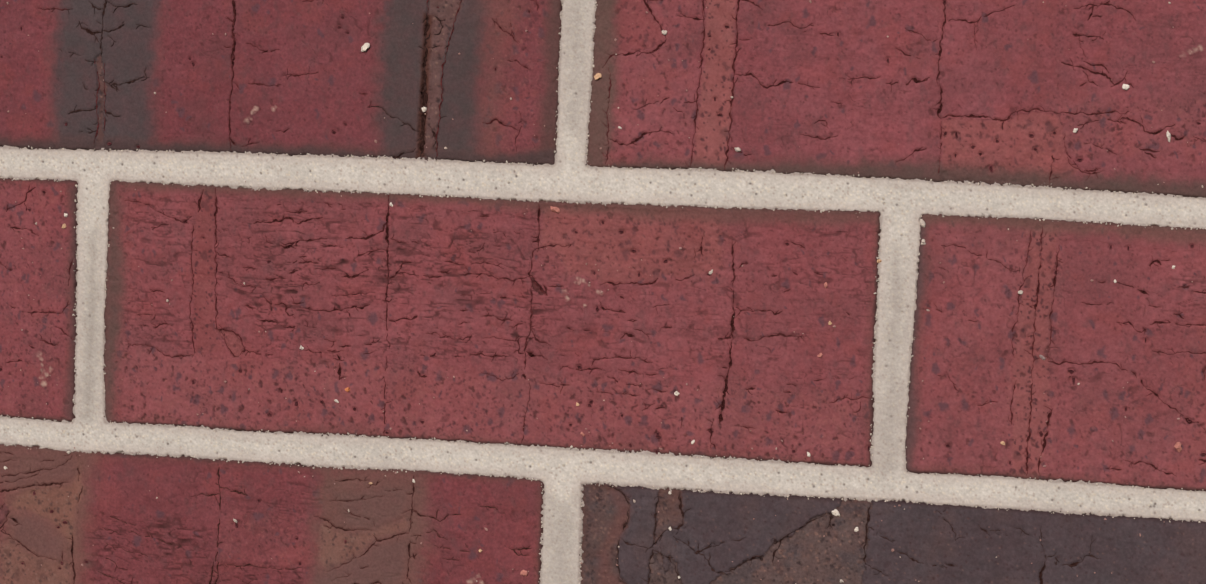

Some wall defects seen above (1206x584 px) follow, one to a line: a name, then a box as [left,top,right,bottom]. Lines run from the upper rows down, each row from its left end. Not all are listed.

crack [41,0,150,133]
crack [224,0,318,149]
crack [359,13,443,158]
crack [602,68,695,164]
crack [1042,0,1206,182]
crack [215,195,868,449]
crack [1082,257,1206,355]
crack [1046,356,1206,475]
crack [61,512,172,584]
crack [191,469,298,584]
crack [324,475,498,584]
crack [866,509,1099,584]